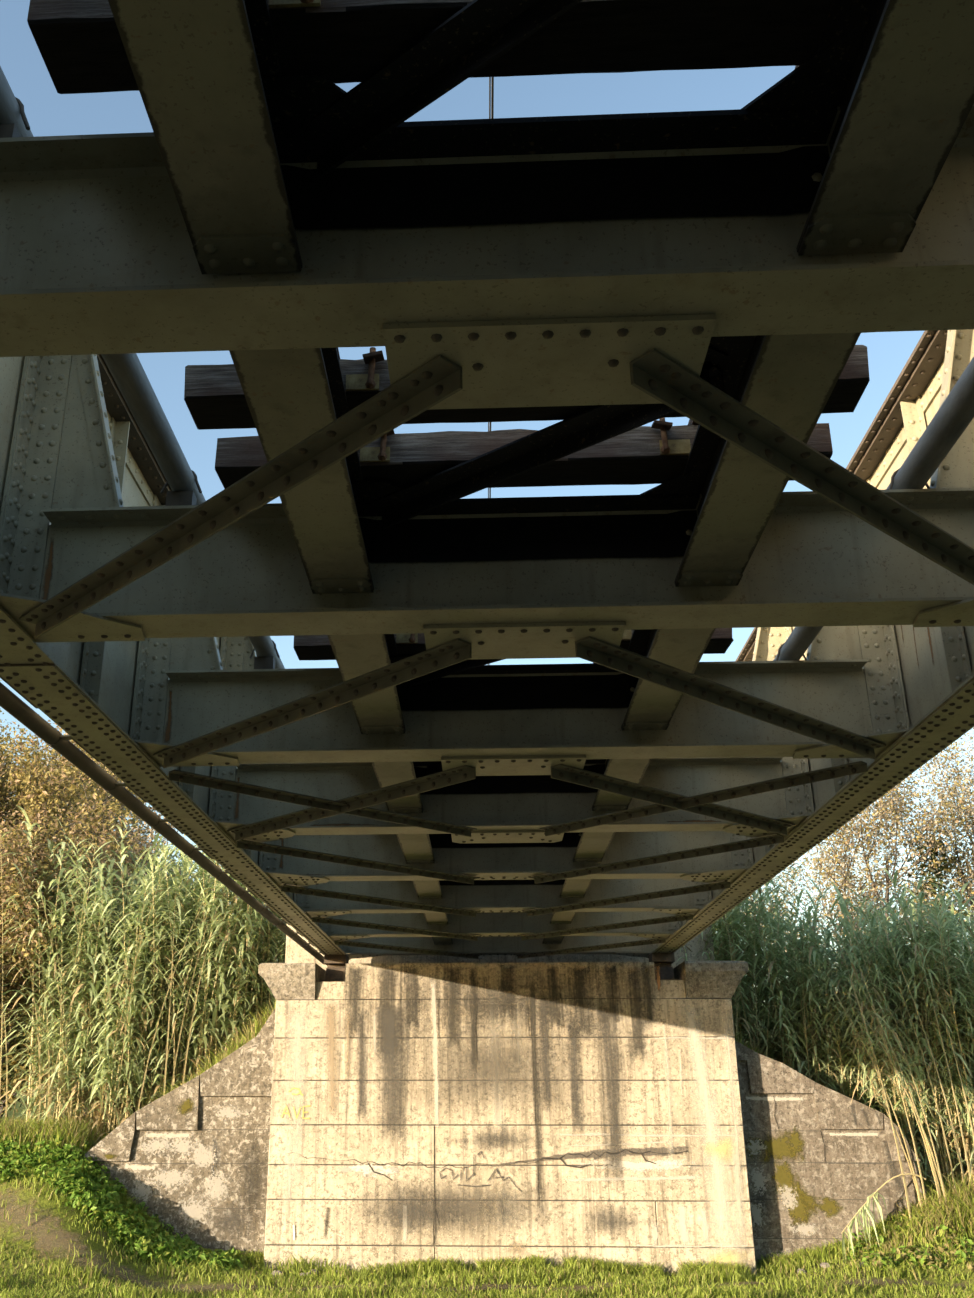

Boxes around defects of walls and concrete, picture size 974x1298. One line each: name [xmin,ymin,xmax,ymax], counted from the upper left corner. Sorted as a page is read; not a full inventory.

crack [287,1126,688,1245]
leakage [327,966,803,1263]
leakage [830,1106,902,1190]